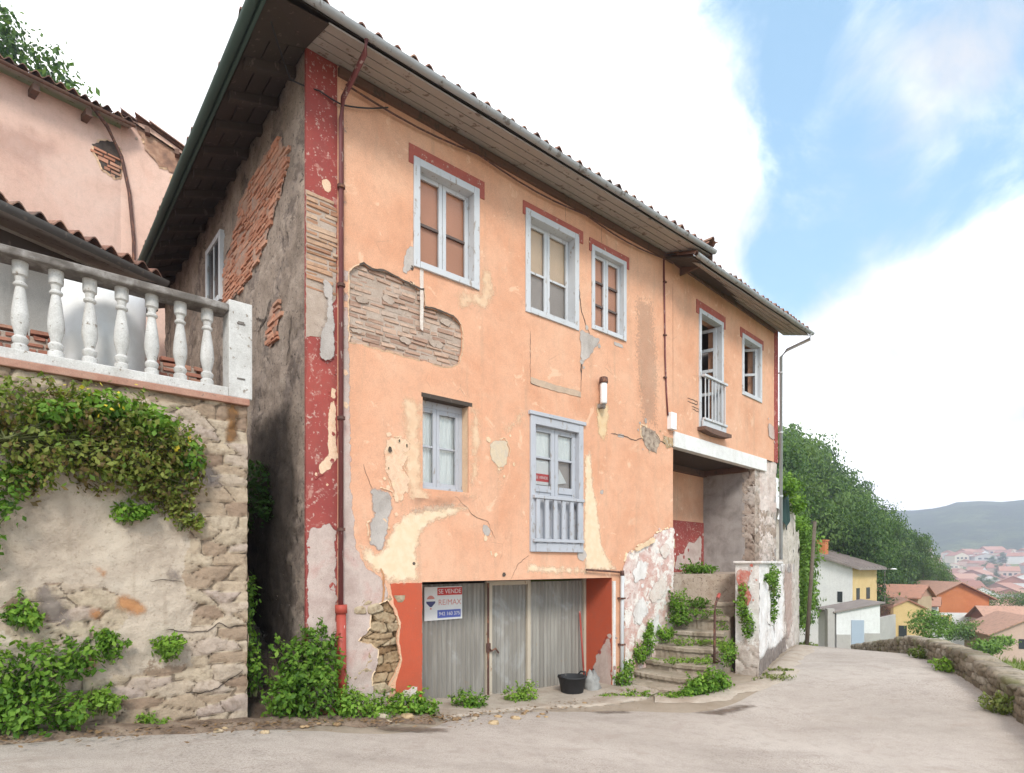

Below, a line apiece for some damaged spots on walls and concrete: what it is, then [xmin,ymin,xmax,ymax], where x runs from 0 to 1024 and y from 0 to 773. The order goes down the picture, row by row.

spalling [90,138,123,180]
spalling [221,136,291,303]
spalling [264,299,284,348]
flaking render [580,325,601,369]
spalling [305,179,494,709]
flaking render [486,434,515,478]
damp [247,410,294,676]
flaking render [528,454,704,685]
peeling [736,564,757,605]